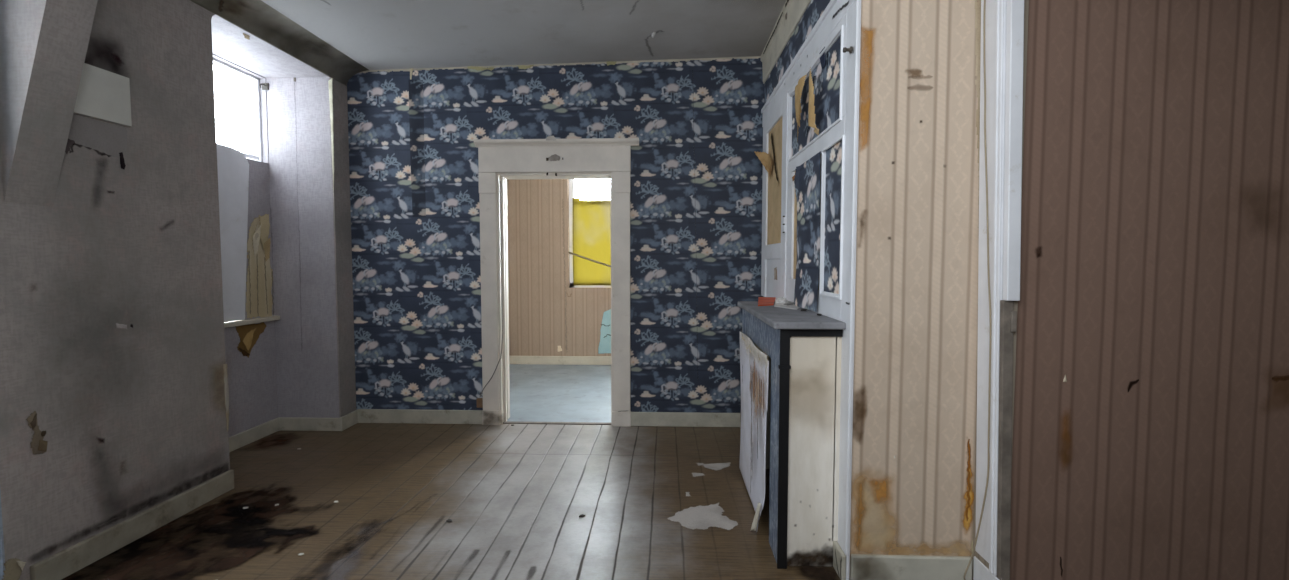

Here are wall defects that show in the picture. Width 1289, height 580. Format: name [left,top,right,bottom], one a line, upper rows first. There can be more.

peeling [30,413,48,452]
water stain [34,466,228,558]